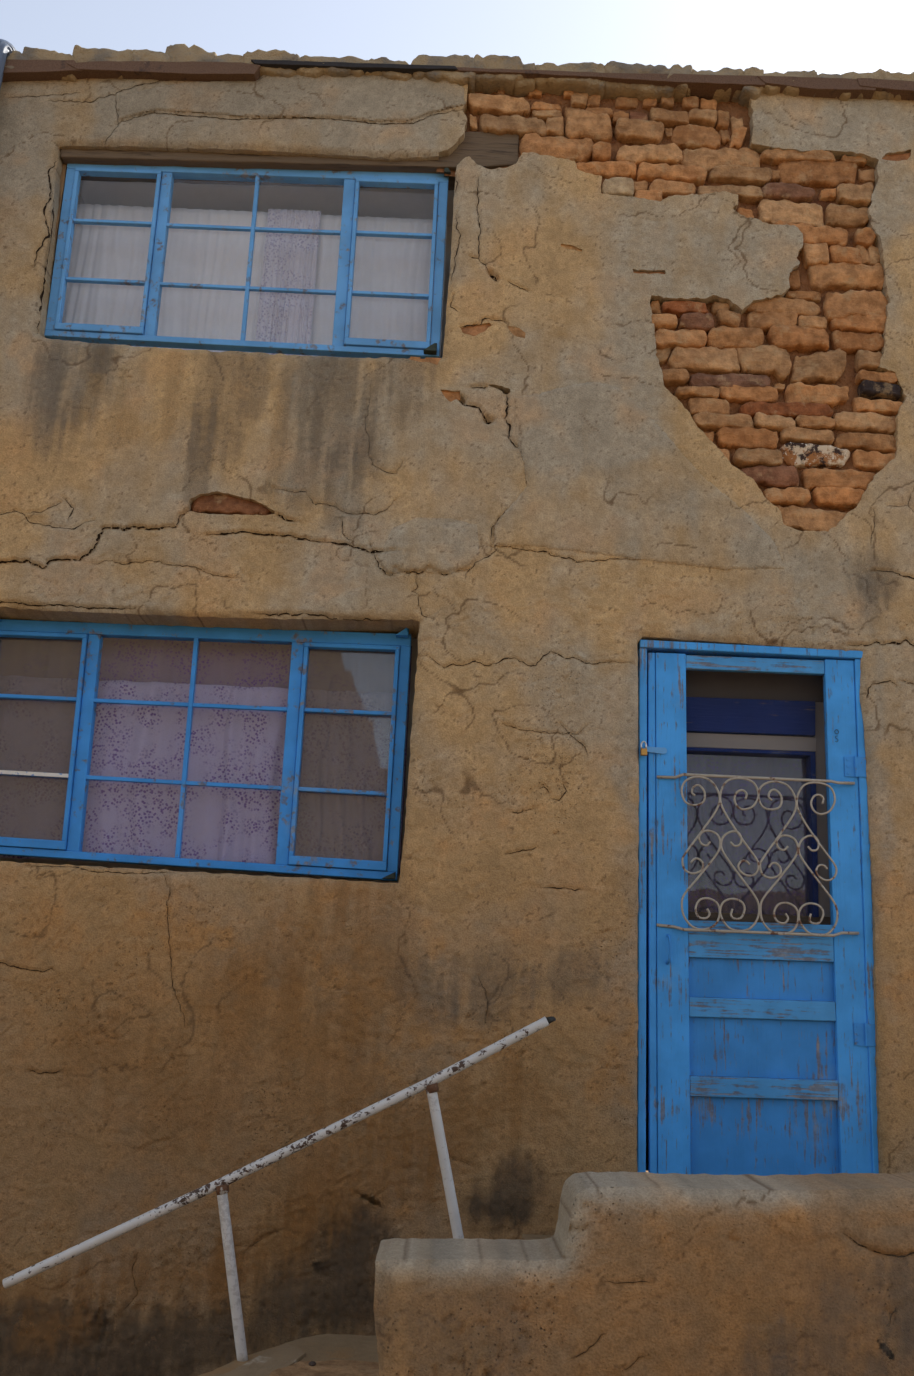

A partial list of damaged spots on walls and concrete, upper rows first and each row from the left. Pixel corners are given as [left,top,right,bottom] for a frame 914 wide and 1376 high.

crack [24,80,458,140]
flaking render [461,89,911,531]
flaking render [191,494,271,515]
crack [0,387,630,617]
crack [871,490,914,579]
crack [266,613,381,621]
crack [434,652,631,668]
crack [848,639,914,647]
damp [255,1209,376,1350]
damp [0,1303,236,1376]